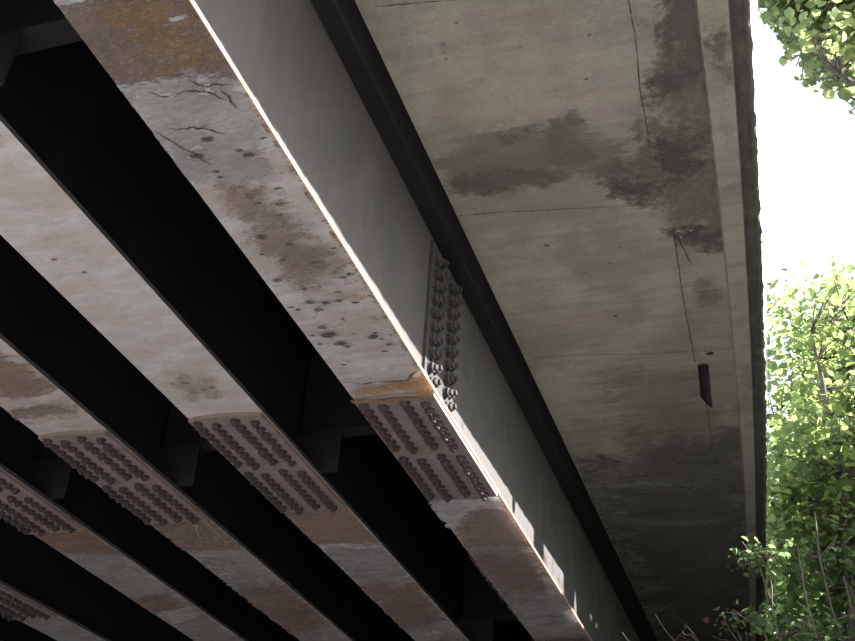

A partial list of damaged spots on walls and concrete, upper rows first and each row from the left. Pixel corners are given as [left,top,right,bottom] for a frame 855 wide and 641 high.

corrosion [53,0,239,88]
crack [374,0,454,8]
crack [628,0,650,148]
leakage [596,0,746,253]
corrosion [213,93,376,303]
crack [645,229,724,361]
corrosion [0,357,76,421]
corrosion [350,330,437,404]